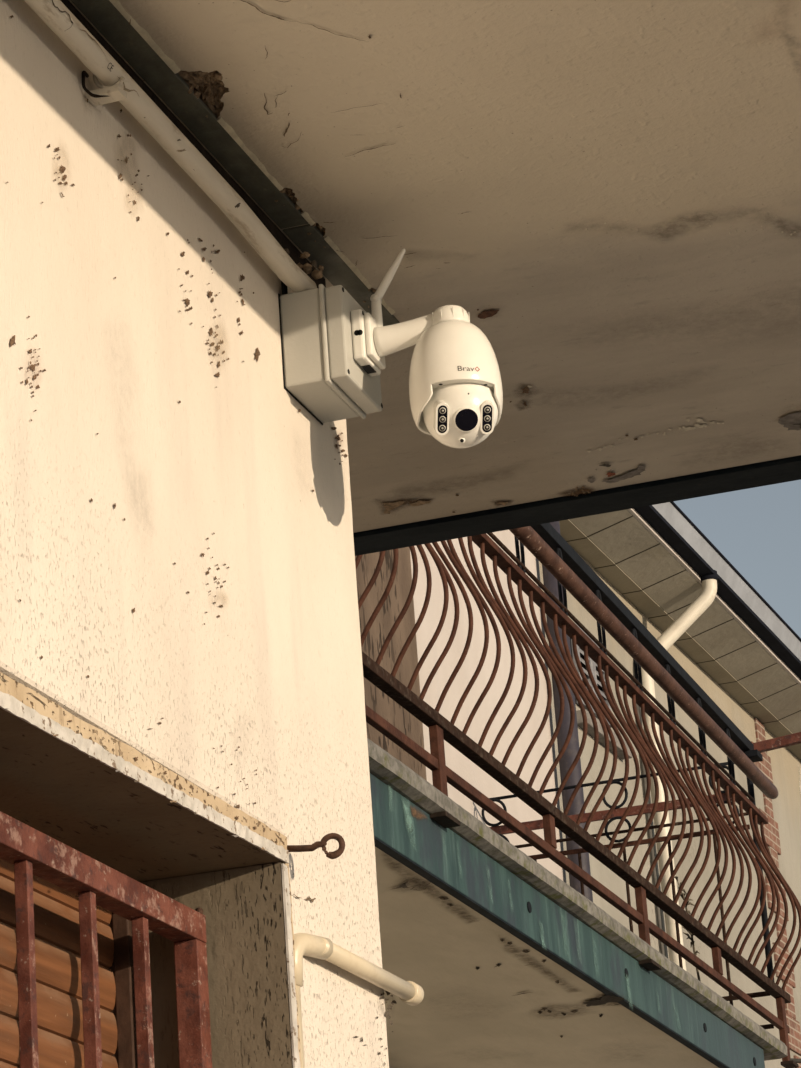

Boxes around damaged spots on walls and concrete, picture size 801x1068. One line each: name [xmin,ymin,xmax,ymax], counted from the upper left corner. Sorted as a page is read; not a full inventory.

crack [241,0,371,41]
spalling [778,412,801,430]
peeling [587,463,646,483]